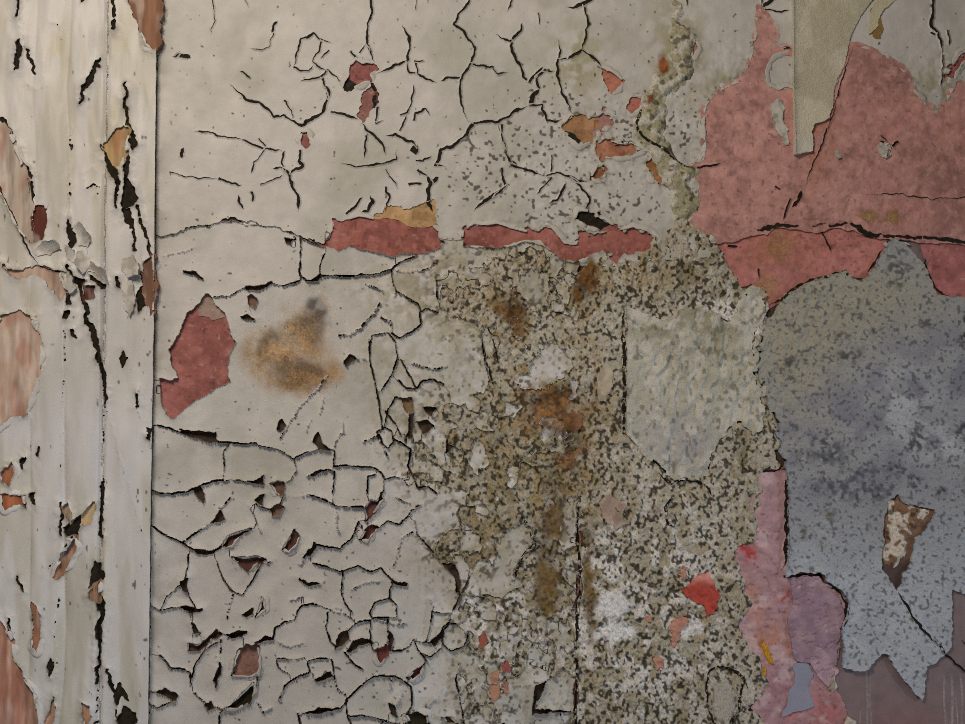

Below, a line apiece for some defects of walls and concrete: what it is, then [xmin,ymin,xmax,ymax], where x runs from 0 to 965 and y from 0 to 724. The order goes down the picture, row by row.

peeling [0,121,109,303]
peeling [128,0,168,55]
crack [169,0,602,215]
crack [615,98,721,170]
peeling [689,4,965,309]
crack [754,45,965,306]
damp [245,315,341,392]
peeling [121,199,661,724]
crack [619,307,629,435]
peeling [0,602,56,724]
crack [571,498,585,724]
peeling [735,470,965,724]